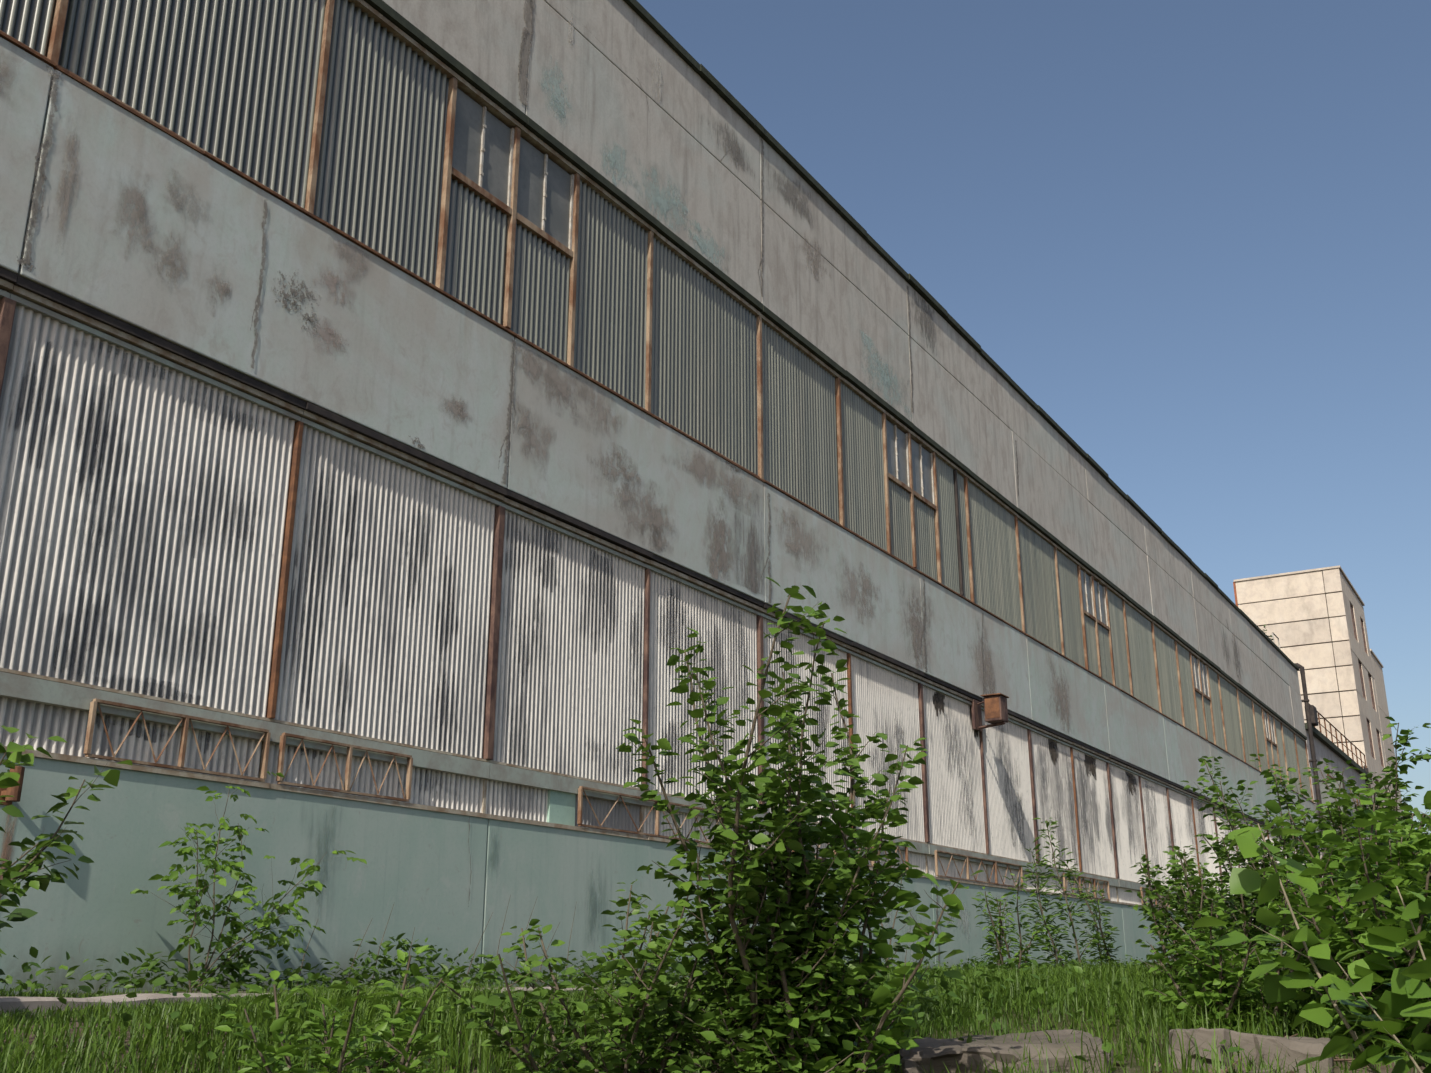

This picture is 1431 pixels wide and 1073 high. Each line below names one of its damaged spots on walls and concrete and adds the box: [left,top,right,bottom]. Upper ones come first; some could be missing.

crack [518,0,535,105]
crack [21,73,59,265]
crack [250,199,268,369]
water stain [690,454,764,593]
water stain [932,692,945,716]
water stain [1048,739,1059,766]
water stain [1084,754,1097,780]
water stain [1125,771,1136,795]